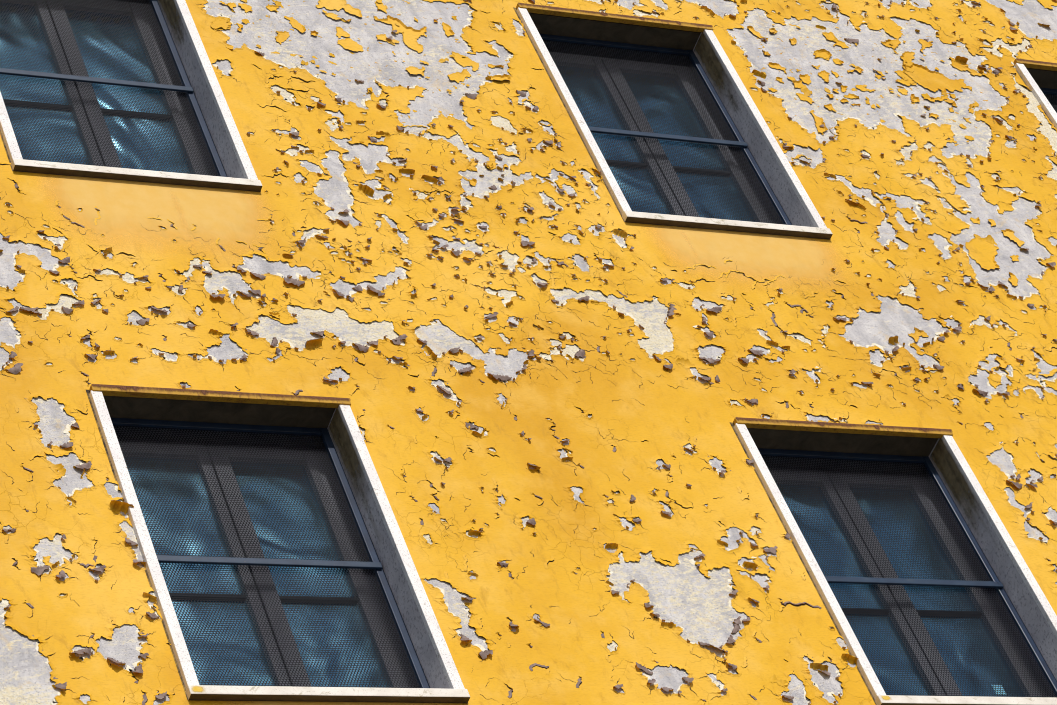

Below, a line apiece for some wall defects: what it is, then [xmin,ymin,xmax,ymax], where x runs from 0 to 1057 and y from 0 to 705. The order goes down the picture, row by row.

crack [251,63,397,151]
crack [0,163,167,300]
peeling [0,0,1057,438]
crack [35,319,107,415]
crack [145,130,1057,537]
peeling [0,595,95,705]
peeling [23,528,112,583]
peeling [66,587,163,676]
peeling [420,569,495,660]
crack [498,528,599,579]
crack [472,602,659,705]
peeling [563,483,792,700]